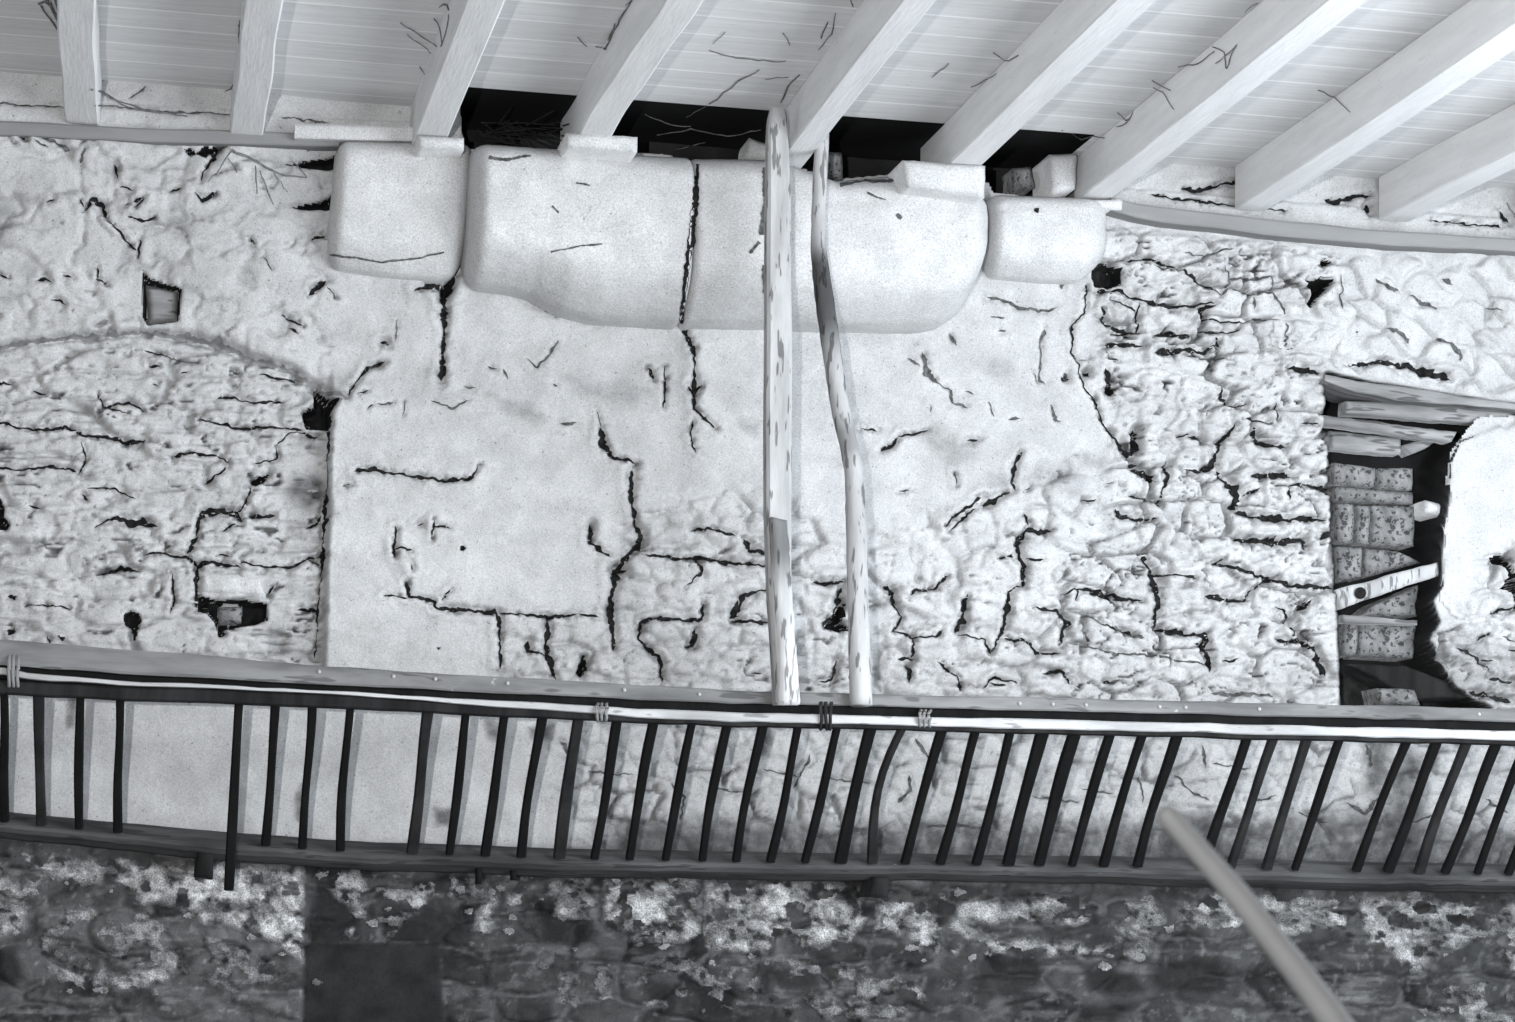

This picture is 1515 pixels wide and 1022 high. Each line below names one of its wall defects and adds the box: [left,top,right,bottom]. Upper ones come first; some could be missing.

crack [0,102,217,258]
crack [488,154,531,162]
crack [551,243,602,253]
crack [648,164,715,452]
crack [0,236,558,658]
crack [861,285,1134,531]
spalling [198,595,268,638]
crack [384,412,643,680]
peeling [0,854,925,1022]
peeling [880,888,1242,971]
peeling [1257,891,1515,975]
peeling [1416,981,1515,1022]